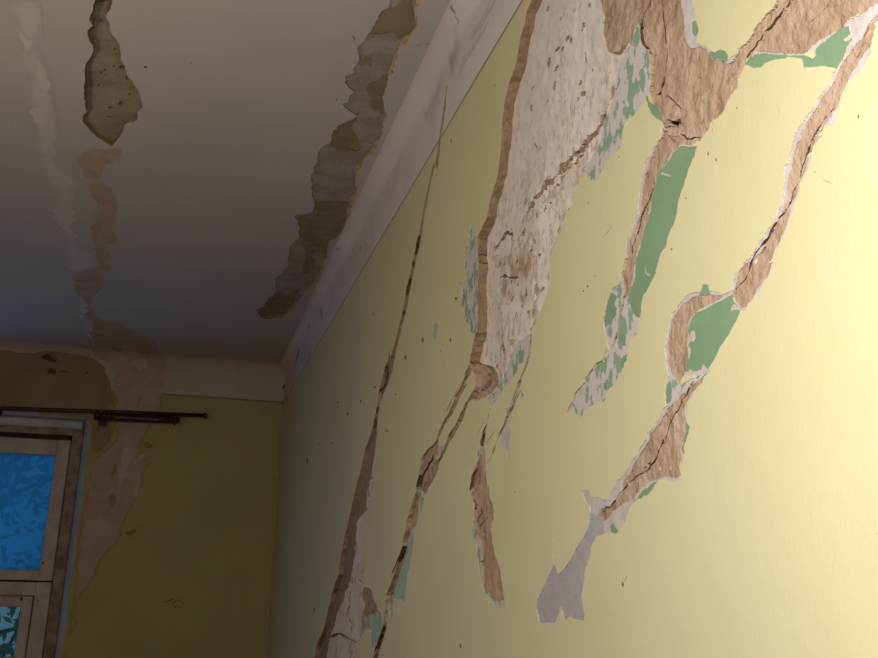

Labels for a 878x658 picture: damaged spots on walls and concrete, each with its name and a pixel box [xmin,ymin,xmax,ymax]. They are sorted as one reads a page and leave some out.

leakage [0,349,115,455]
peeling [63,421,152,658]
peeling [70,0,170,412]
peeling [256,0,424,319]
crack [315,86,532,658]
spalling [455,0,878,609]